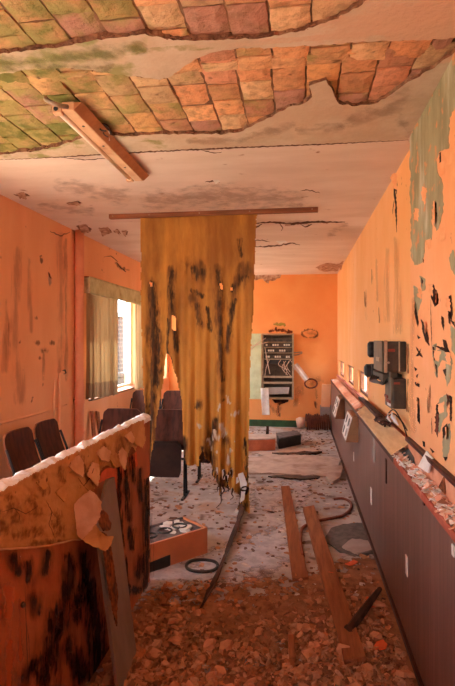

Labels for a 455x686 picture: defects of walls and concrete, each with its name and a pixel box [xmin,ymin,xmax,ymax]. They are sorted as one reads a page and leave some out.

spalling [0,0,365,53]
crack [5,153,105,161]
spalling [0,38,455,265]
crack [129,140,403,154]
crack [255,221,341,248]
peeling [316,261,344,272]
peeling [413,276,455,461]
peeling [0,420,146,626]
leakage [2,550,109,686]